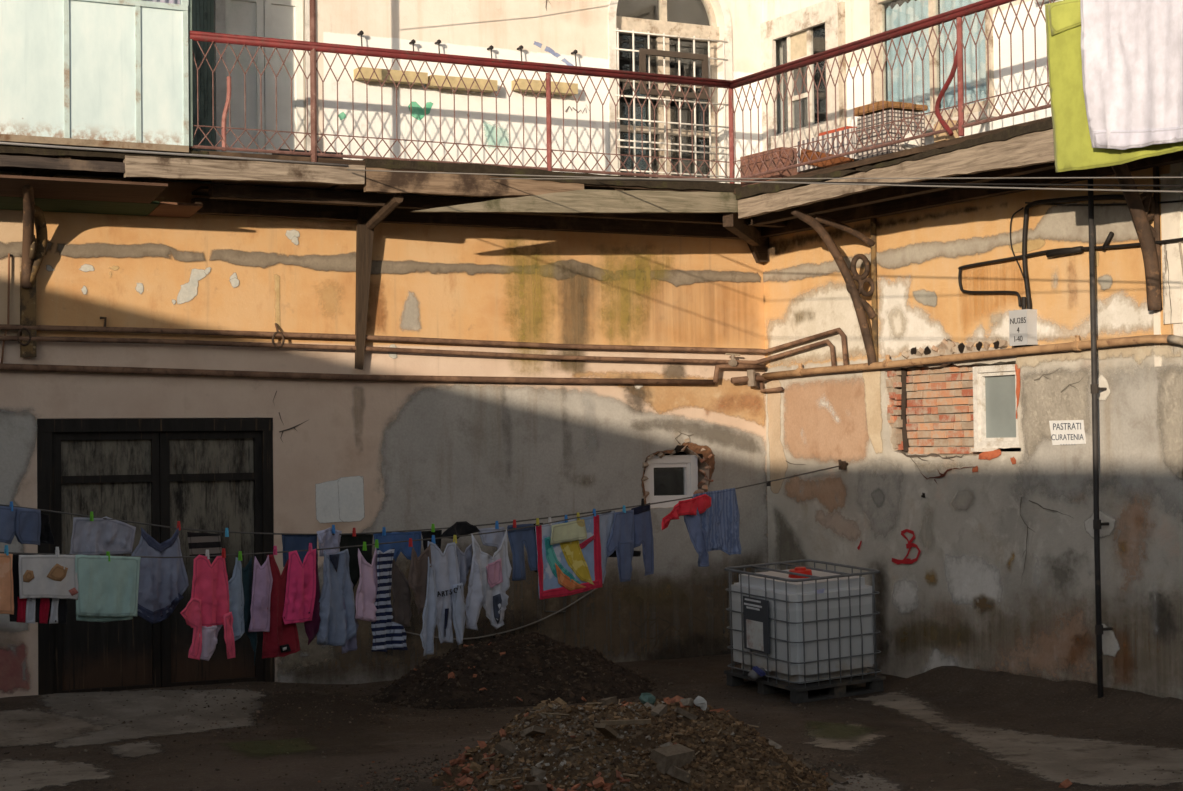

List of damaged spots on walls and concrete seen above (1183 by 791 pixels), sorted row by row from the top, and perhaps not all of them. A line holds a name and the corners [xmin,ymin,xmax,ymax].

peeling [285,229,300,245]
peeling [172,267,211,304]
peeling [400,292,421,331]
leakage [561,266,589,372]
peeling [767,282,866,366]
peeling [878,250,1181,419]
peeling [574,371,766,426]
spalling [641,438,715,504]
spalling [972,449,1016,473]
crack [1020,497,1073,584]
leakage [875,553,1183,691]
peeling [0,644,30,693]